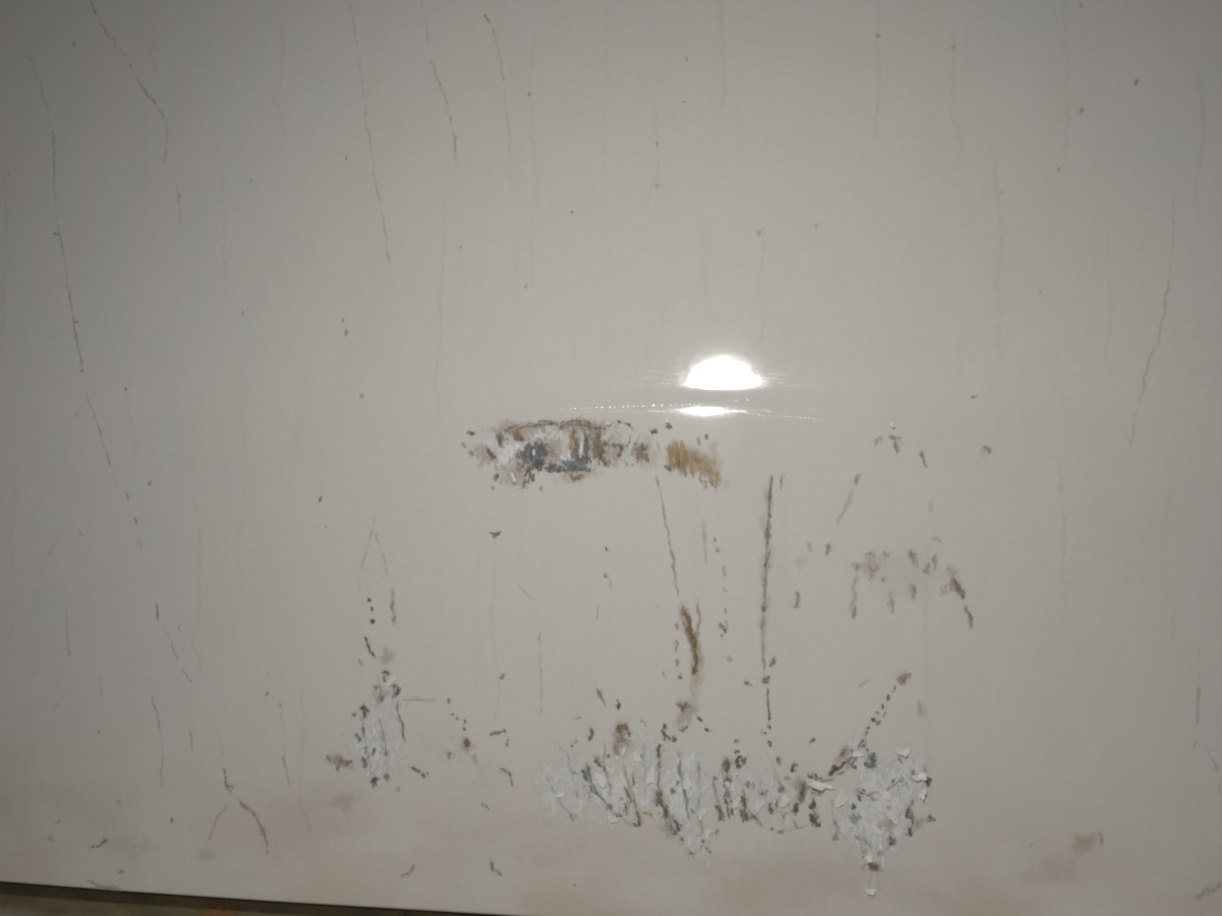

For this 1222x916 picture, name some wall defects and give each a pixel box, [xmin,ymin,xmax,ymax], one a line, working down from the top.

peeling [469,419,672,489]
rust [685,605,700,674]
peeling [344,671,404,787]
peeling [533,703,935,897]